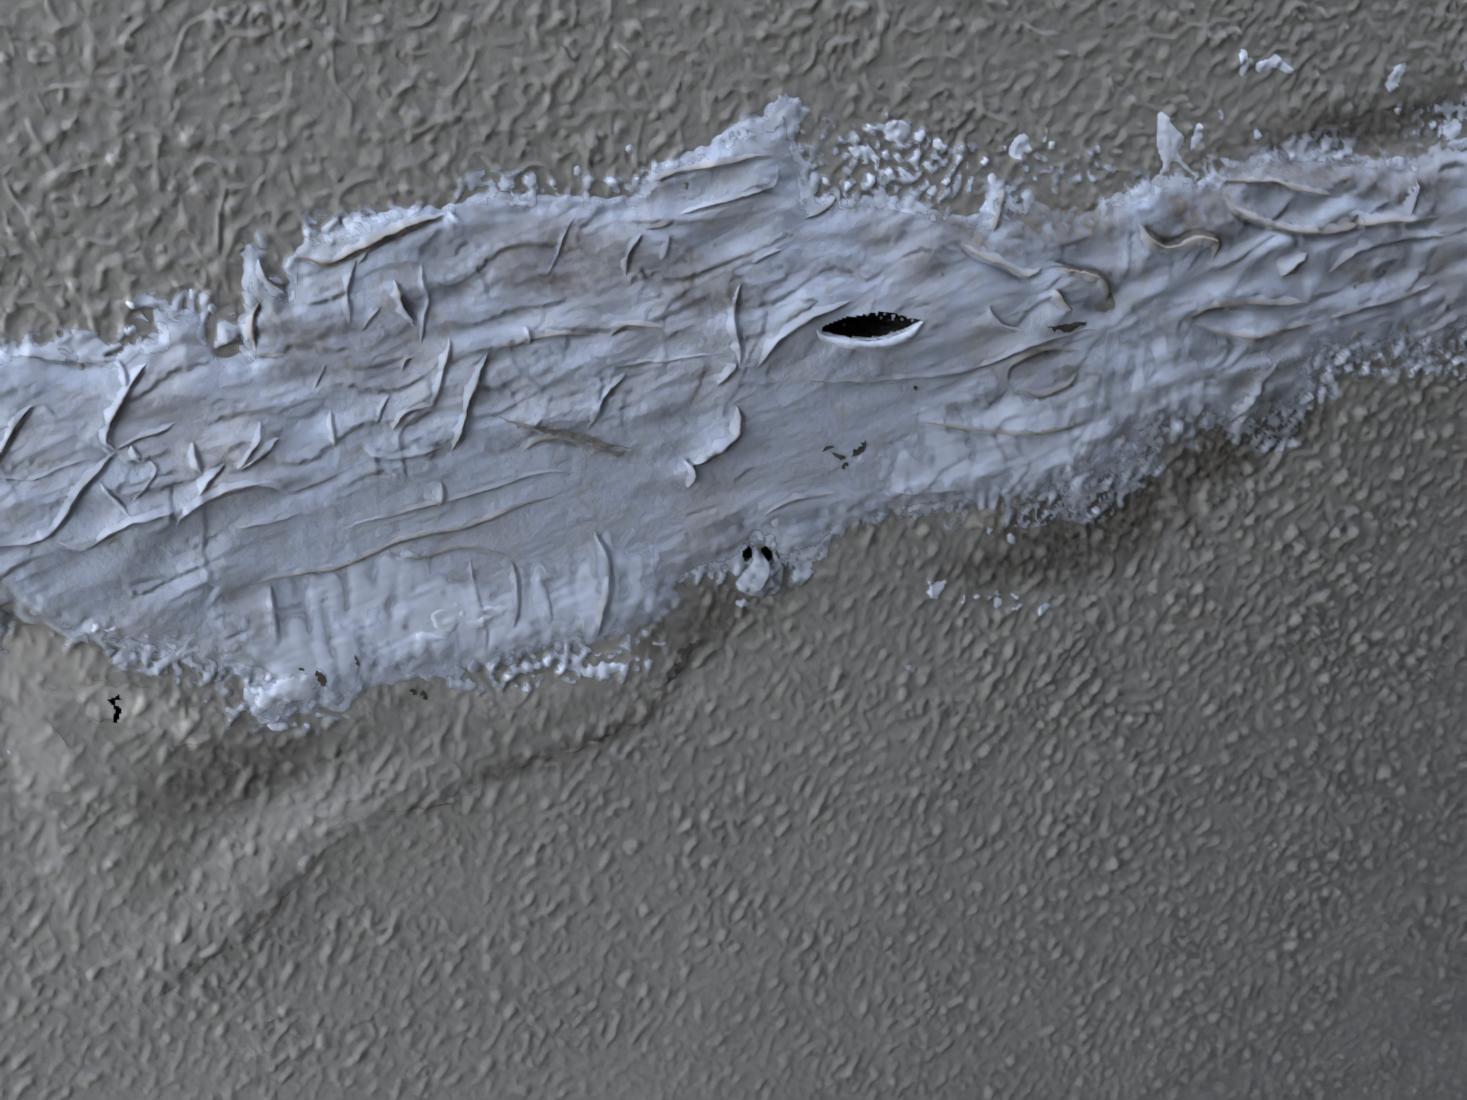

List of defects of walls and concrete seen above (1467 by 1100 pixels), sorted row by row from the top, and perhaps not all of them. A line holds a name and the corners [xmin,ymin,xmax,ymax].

peeling [1239,49,1294,77]
peeling [822,112,963,196]
peeling [1003,133,1055,163]
peeling [1157,112,1203,175]
hole [822,311,918,338]
crack [1048,321,1087,333]
crack [492,415,634,458]
crack [822,440,866,470]
crack [299,655,360,687]
peeling [491,642,628,693]
spalling [107,694,121,723]
crack [380,639,701,812]